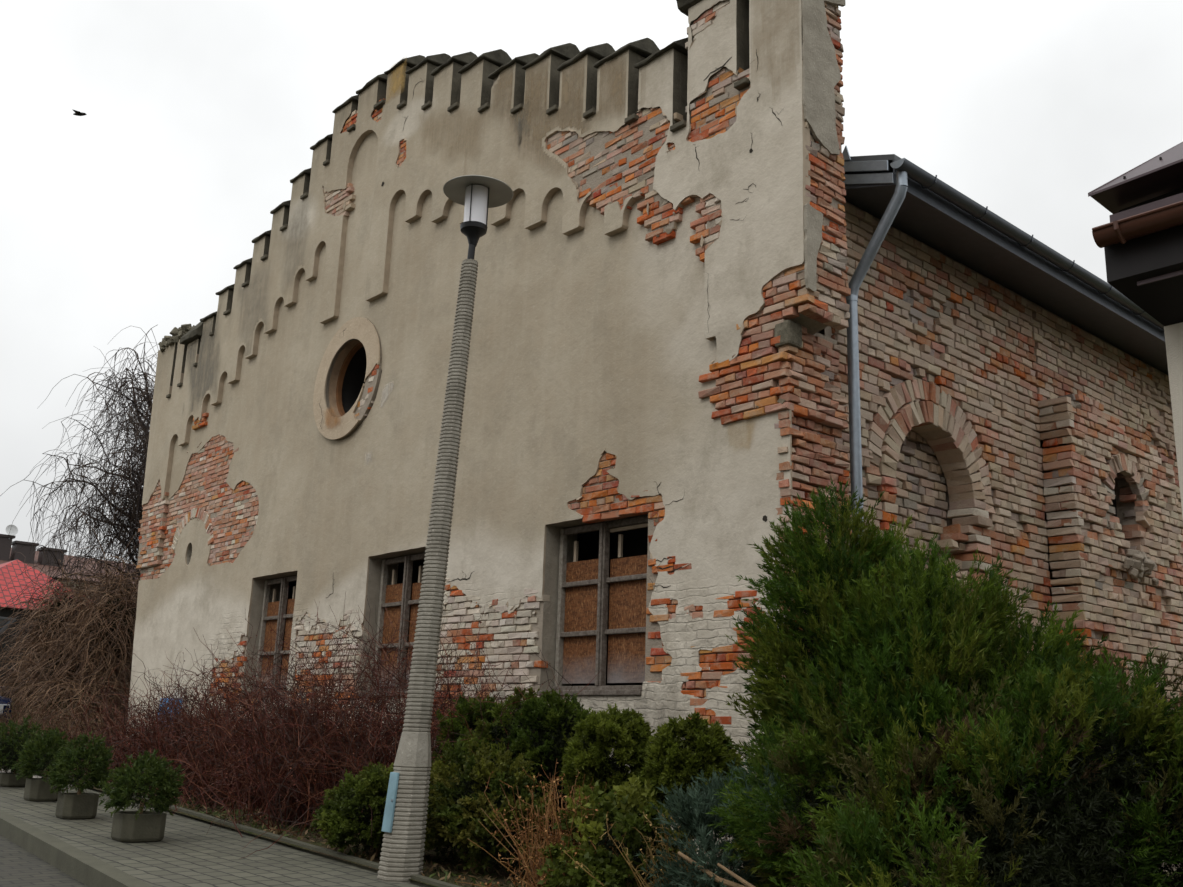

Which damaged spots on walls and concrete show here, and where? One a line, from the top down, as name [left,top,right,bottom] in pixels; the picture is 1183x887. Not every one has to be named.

spalling [685,0,730,50]
spalling [323,183,356,217]
spalling [341,99,386,133]
spalling [397,138,406,167]
spalling [543,68,751,262]
spalling [698,263,815,425]
spalling [136,413,259,580]
spalling [568,448,764,724]
spalling [209,631,258,710]
spalling [292,609,379,726]
spalling [432,578,550,728]